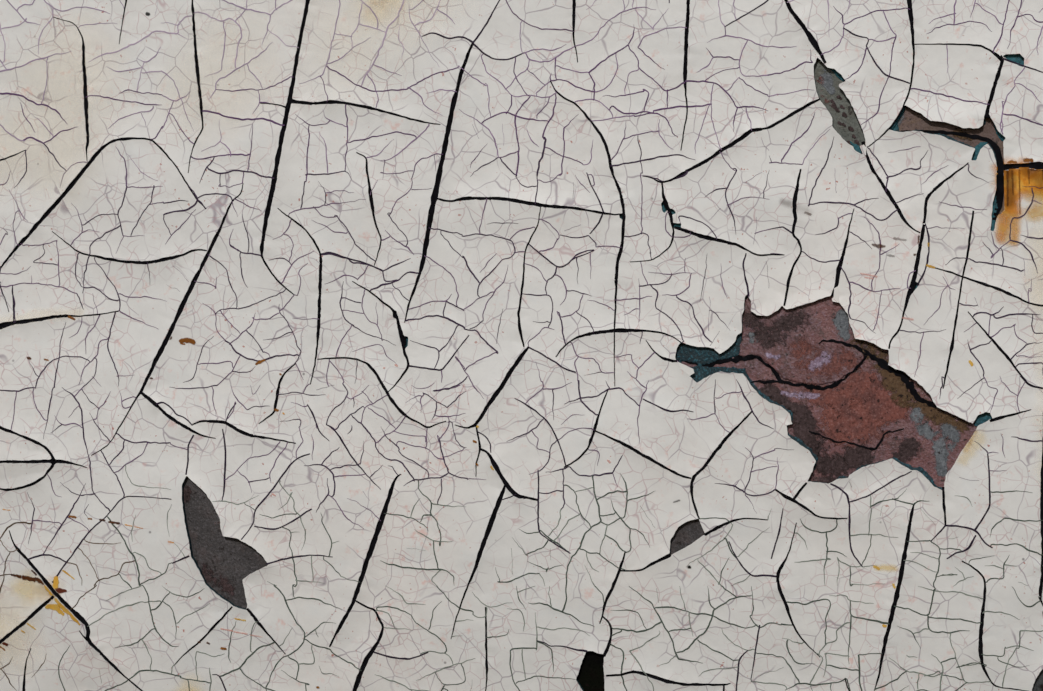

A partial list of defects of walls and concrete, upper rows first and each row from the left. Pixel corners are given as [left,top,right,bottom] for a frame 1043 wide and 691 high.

peeling [814,58,866,155]
corrosion [996,158,1043,239]
crack [0,0,820,691]
peeling [676,286,993,489]
peeling [184,477,267,609]
peeling [669,519,704,556]
crack [655,437,1043,691]
peeling [577,651,605,691]
peeling [1032,669,1043,691]